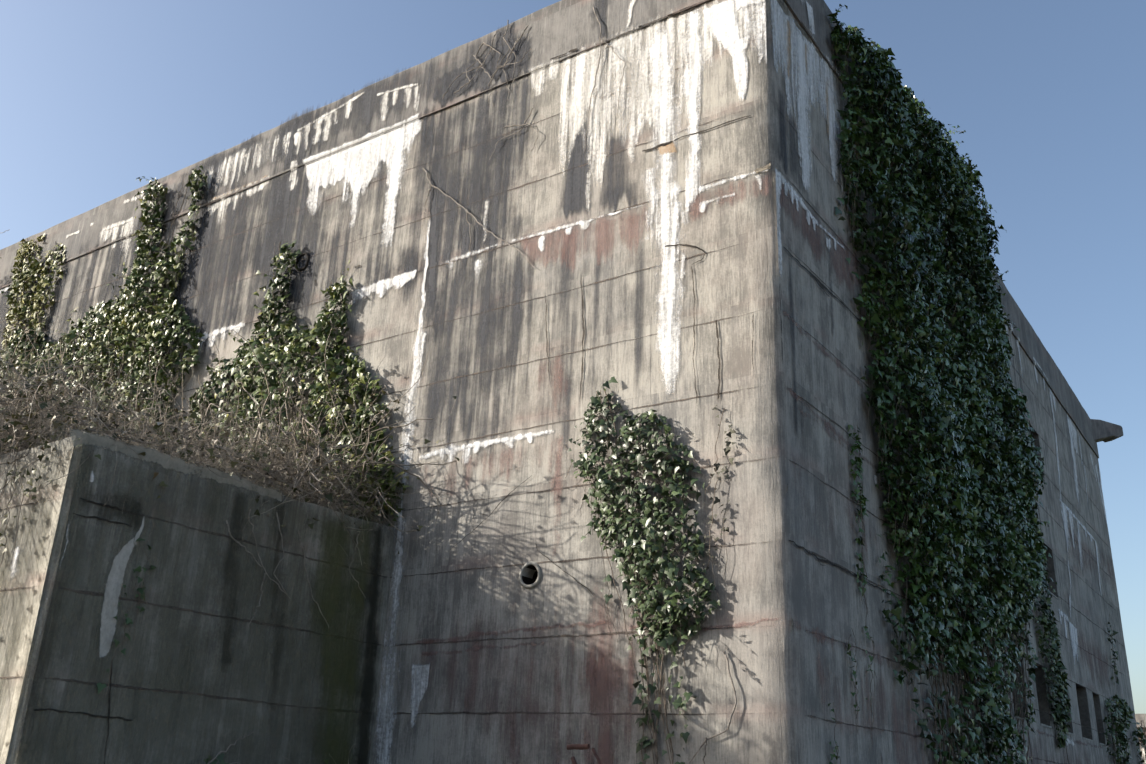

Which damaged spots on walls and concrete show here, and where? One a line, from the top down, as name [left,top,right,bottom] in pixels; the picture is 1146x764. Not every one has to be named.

peeling [99,517,144,657]
damp [0,0,856,764]
damp [1003,315,1108,665]